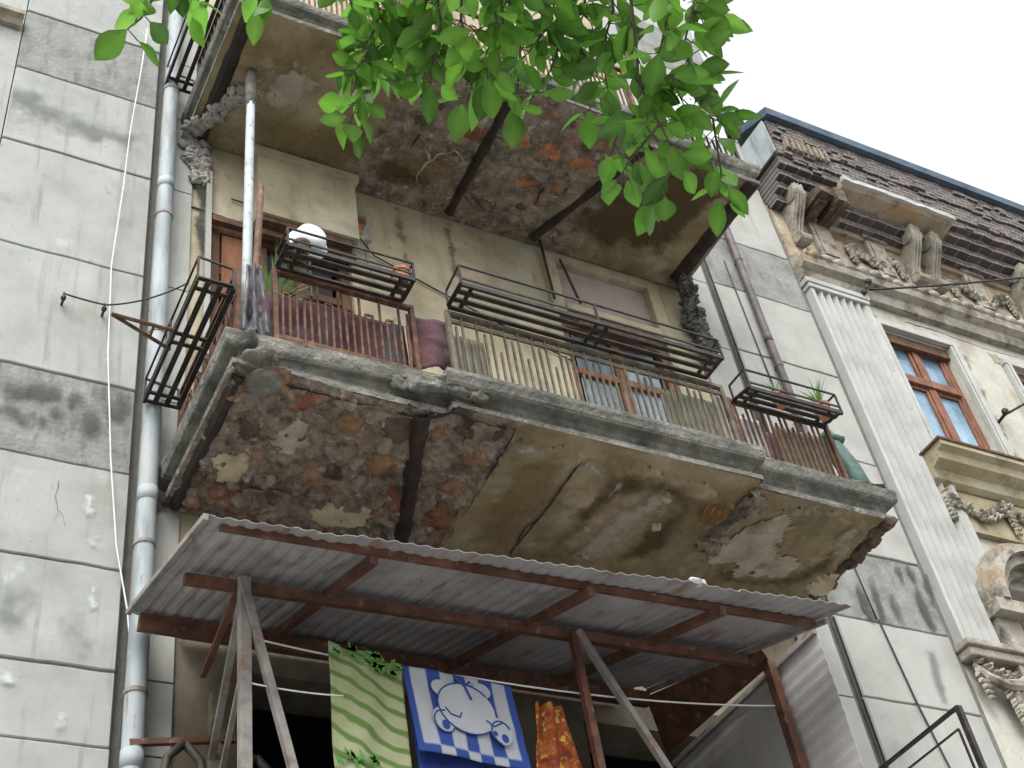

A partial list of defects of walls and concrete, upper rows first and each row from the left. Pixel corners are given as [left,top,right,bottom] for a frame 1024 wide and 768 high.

peeling [256,60,321,118]
spalling [386,82,630,231]
peeling [355,212,374,250]
damp [0,383,130,432]
spalling [175,364,517,548]
crack [509,463,581,555]
damp [579,478,689,558]
peeling [707,514,802,578]
spalling [802,516,899,601]